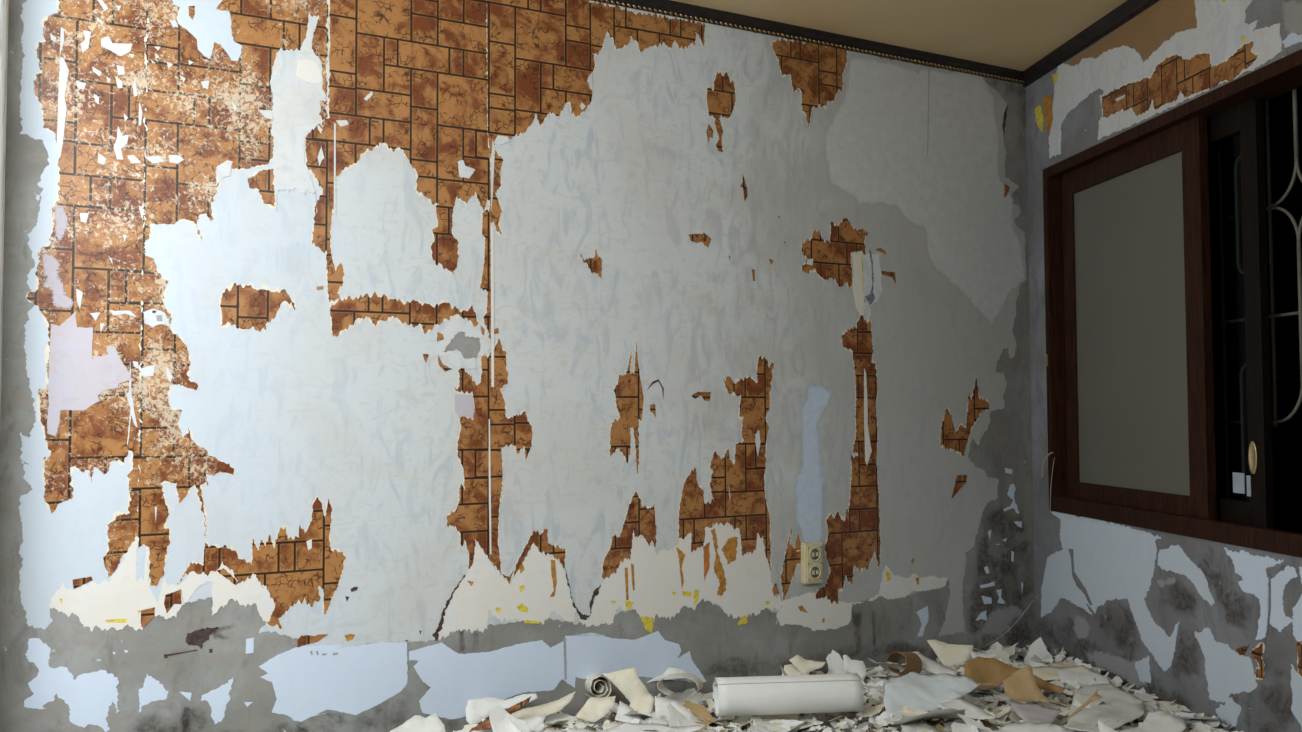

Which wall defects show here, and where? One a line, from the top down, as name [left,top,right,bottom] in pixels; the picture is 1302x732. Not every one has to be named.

peeling [76,0,184,177]
peeling [150,46,209,89]
peeling [216,160,233,186]
peeling [458,160,475,178]
peeling [491,135,510,210]
peeling [76,289,136,331]
spalling [436,318,491,370]
peeling [133,361,173,382]
peeling [1267,565,1302,632]
spalling [164,627,219,659]
water stain [1049,613,1186,706]
peeling [1216,697,1242,730]